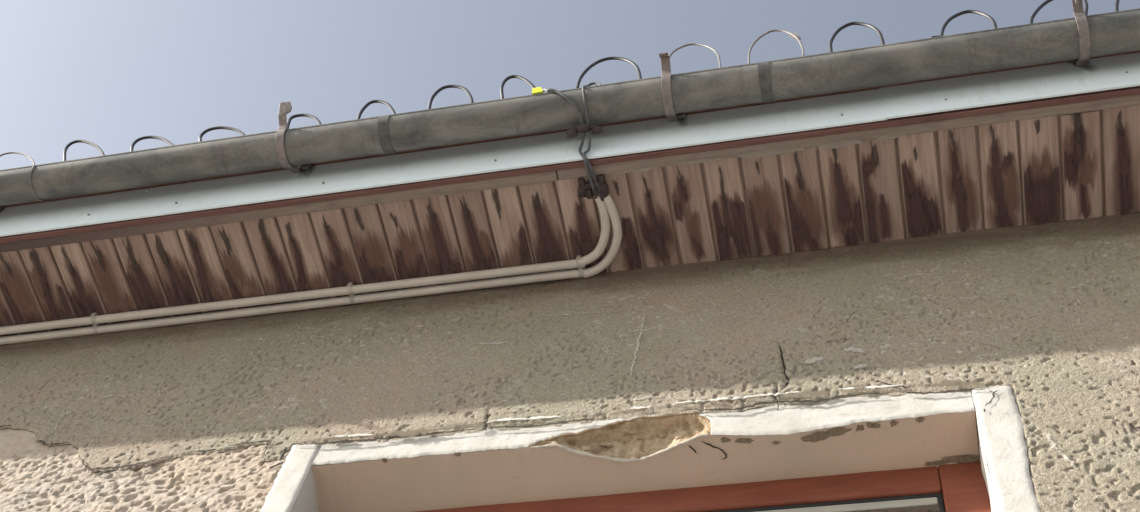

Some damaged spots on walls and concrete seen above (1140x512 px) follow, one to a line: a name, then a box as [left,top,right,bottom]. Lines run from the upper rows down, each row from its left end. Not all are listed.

water stain [0,124,1140,352]
crack [681,343,998,412]
peeling [328,428,440,442]
crack [688,441,727,460]
spalling [527,384,903,462]